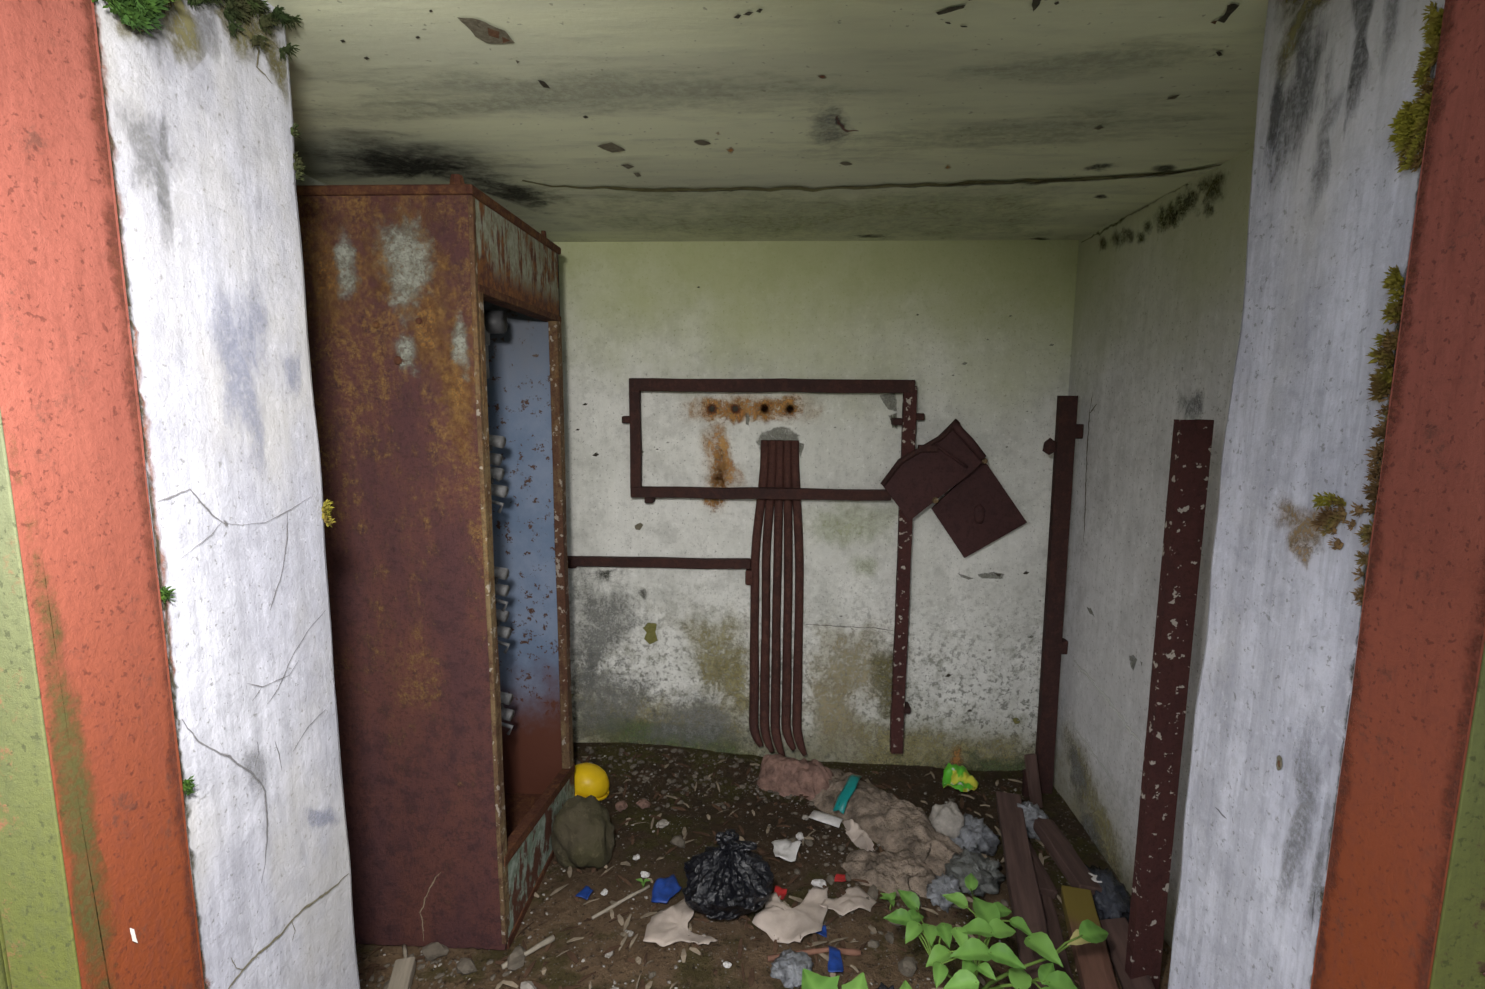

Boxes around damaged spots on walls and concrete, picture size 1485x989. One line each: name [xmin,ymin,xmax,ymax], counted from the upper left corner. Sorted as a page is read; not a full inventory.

spalling [457,17,520,64]
damp [1268,30,1321,161]
damp [1347,0,1398,109]
damp [130,122,170,223]
mould [320,140,545,203]
crack [522,164,1222,192]
crack [96,21,349,989]
corrosion [690,397,798,508]
damp [574,570,749,750]
damp [872,654,893,718]